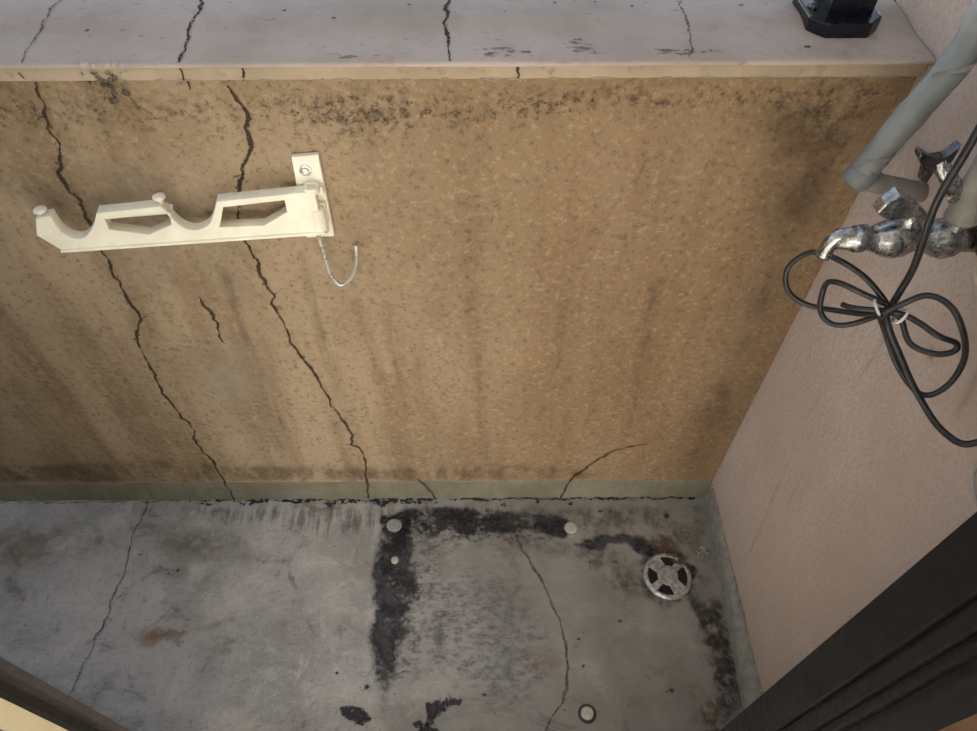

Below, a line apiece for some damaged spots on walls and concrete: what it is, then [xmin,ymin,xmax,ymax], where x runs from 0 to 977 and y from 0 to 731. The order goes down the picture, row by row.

crack [177,0,204,90]
crack [442,0,451,61]
crack [680,2,694,56]
crack [19,0,92,227]
crack [0,68,695,731]
water stain [577,510,710,590]
water stain [369,507,568,695]